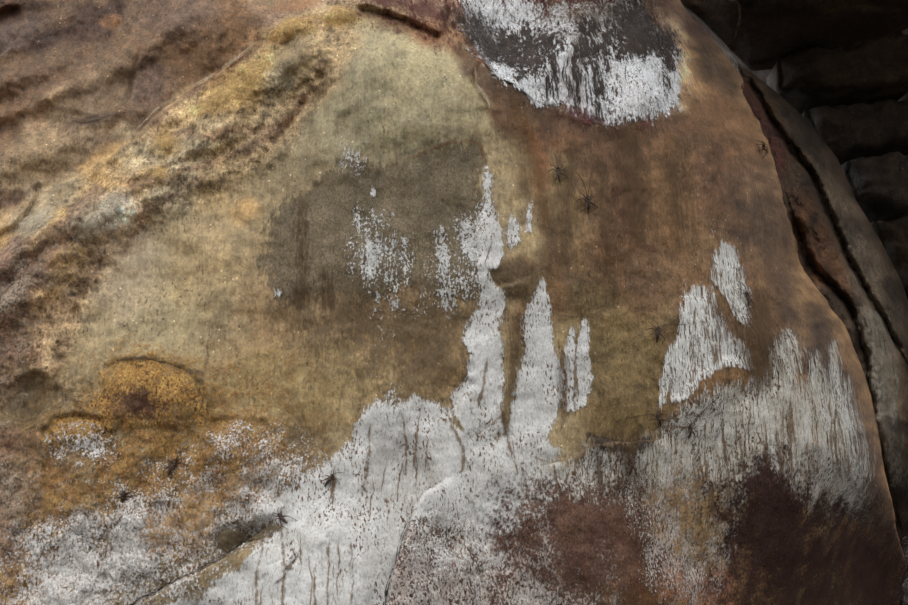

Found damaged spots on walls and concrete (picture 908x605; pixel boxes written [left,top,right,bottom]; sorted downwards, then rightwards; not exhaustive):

crack [432,412,506,487]
crack [384,506,414,605]